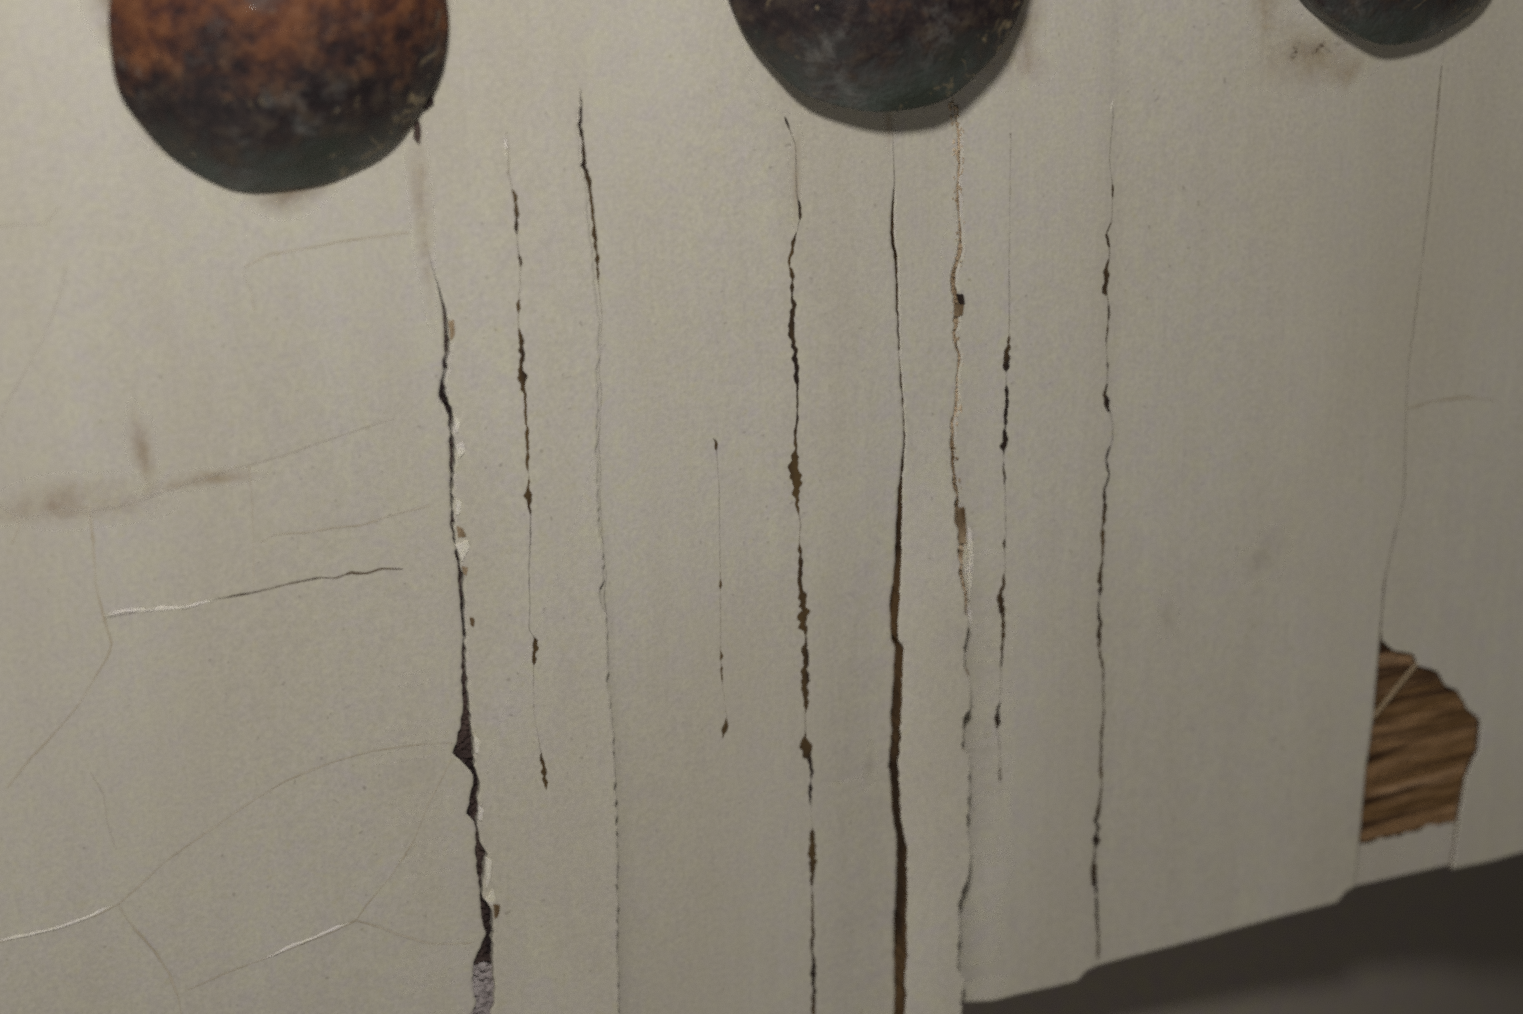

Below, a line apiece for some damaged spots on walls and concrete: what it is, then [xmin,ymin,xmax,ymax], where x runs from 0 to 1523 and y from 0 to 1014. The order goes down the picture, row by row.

crack [0,290,500,1014]
rust [413,92,434,143]
crack [504,133,548,790]
crack [578,88,608,642]
crack [784,117,817,1014]
crack [994,229,1011,781]
crack [1091,101,1114,958]
peeling [1355,641,1477,886]